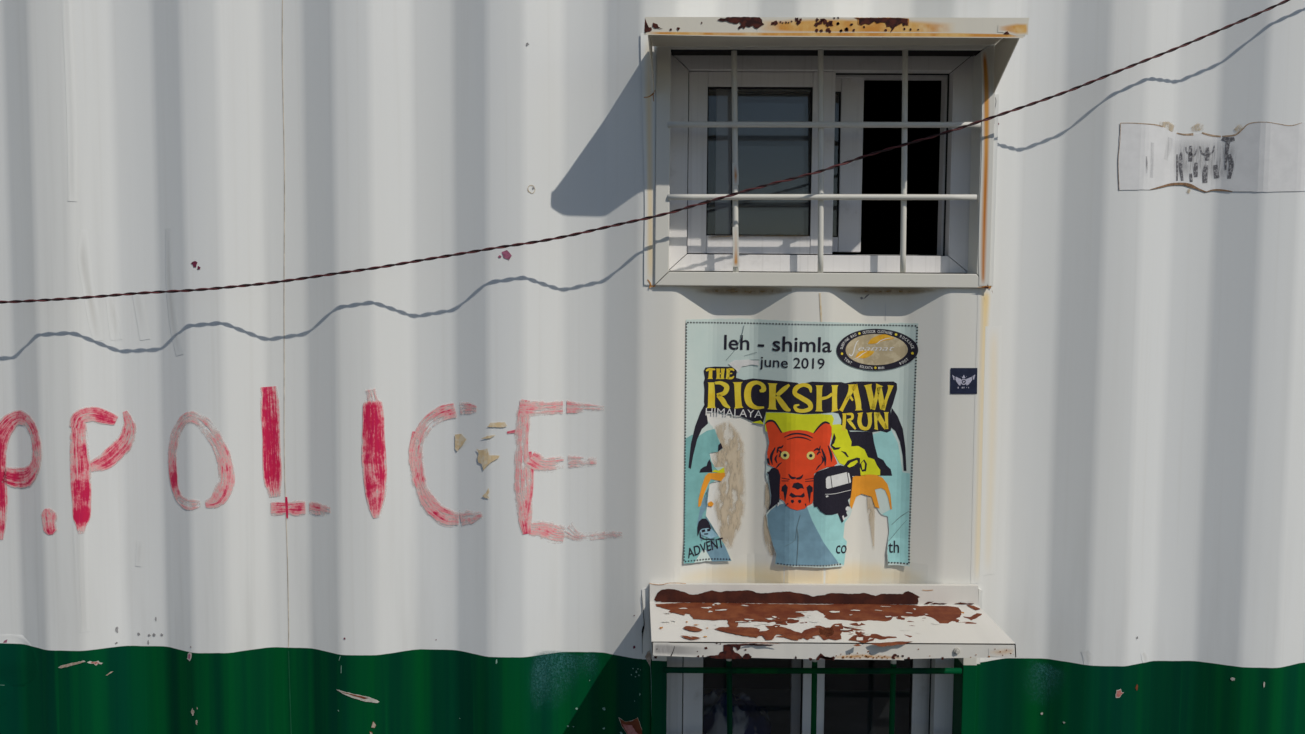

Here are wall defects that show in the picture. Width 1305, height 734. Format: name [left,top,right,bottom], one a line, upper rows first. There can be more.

peeling [455,422,507,470]
rust [641,17,1028,584]